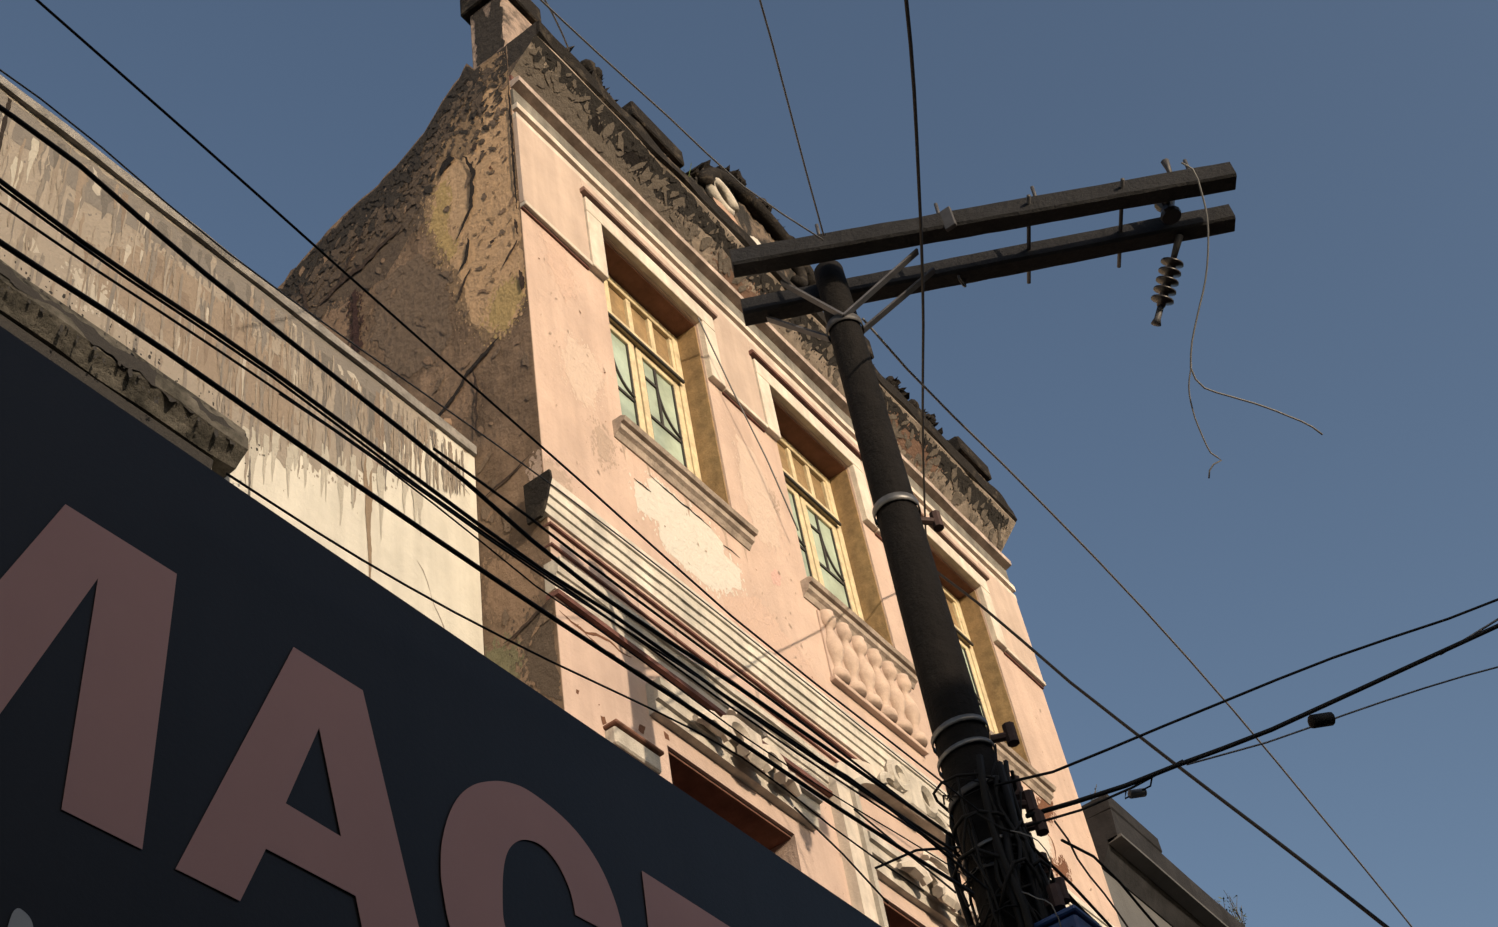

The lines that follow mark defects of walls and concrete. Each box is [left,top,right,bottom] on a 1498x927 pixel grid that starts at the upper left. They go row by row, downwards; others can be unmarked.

damp [0,0,781,540]
peeling [422,82,528,347]
crack [457,83,517,300]
peeling [439,363,496,432]
peeling [628,470,747,599]
damp [779,315,845,397]
damp [880,387,1009,549]